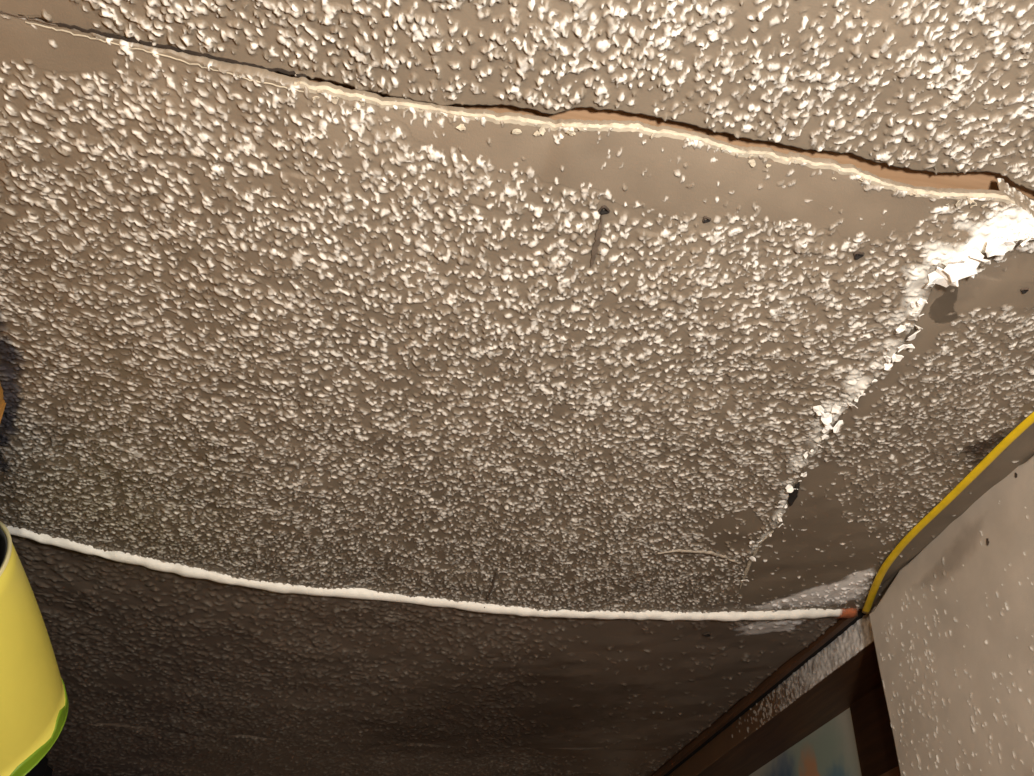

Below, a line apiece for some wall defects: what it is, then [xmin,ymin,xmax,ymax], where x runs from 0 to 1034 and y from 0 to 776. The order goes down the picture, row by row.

crack [0,11,1015,208]
spalling [813,233,1034,433]
spalling [699,458,886,606]